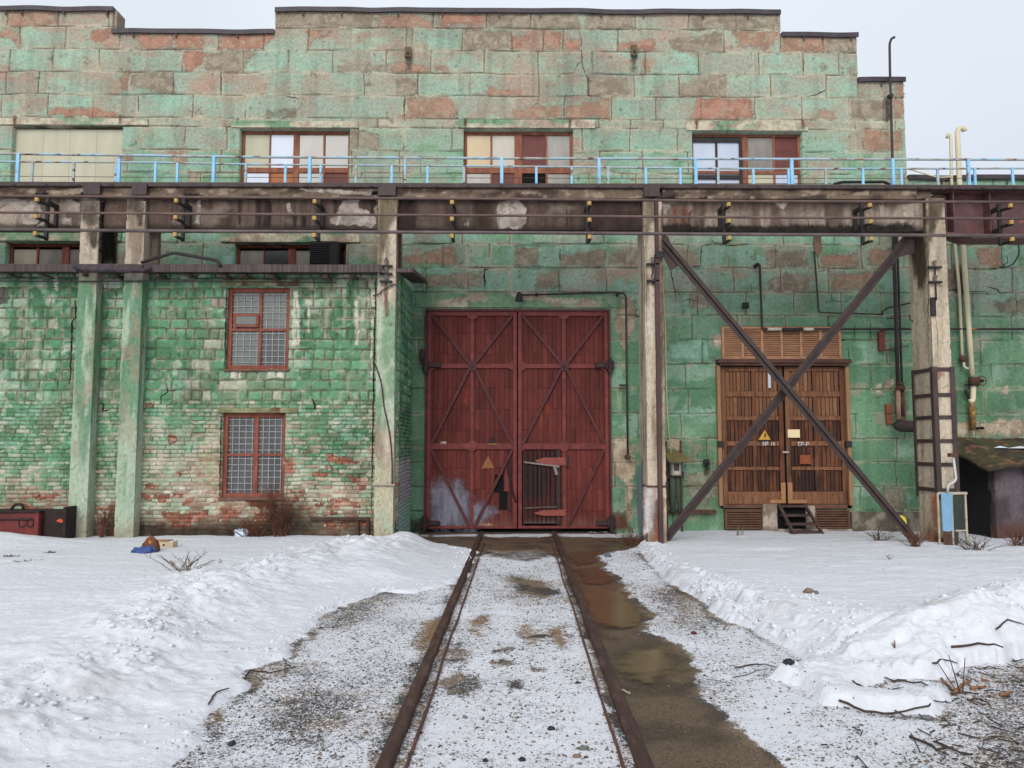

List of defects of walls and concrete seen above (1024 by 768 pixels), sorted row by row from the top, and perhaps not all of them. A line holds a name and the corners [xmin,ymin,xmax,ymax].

spalling [300,188,380,228]
spalling [496,200,527,229]
flaking render [141,483,241,530]
flaking render [291,454,371,529]